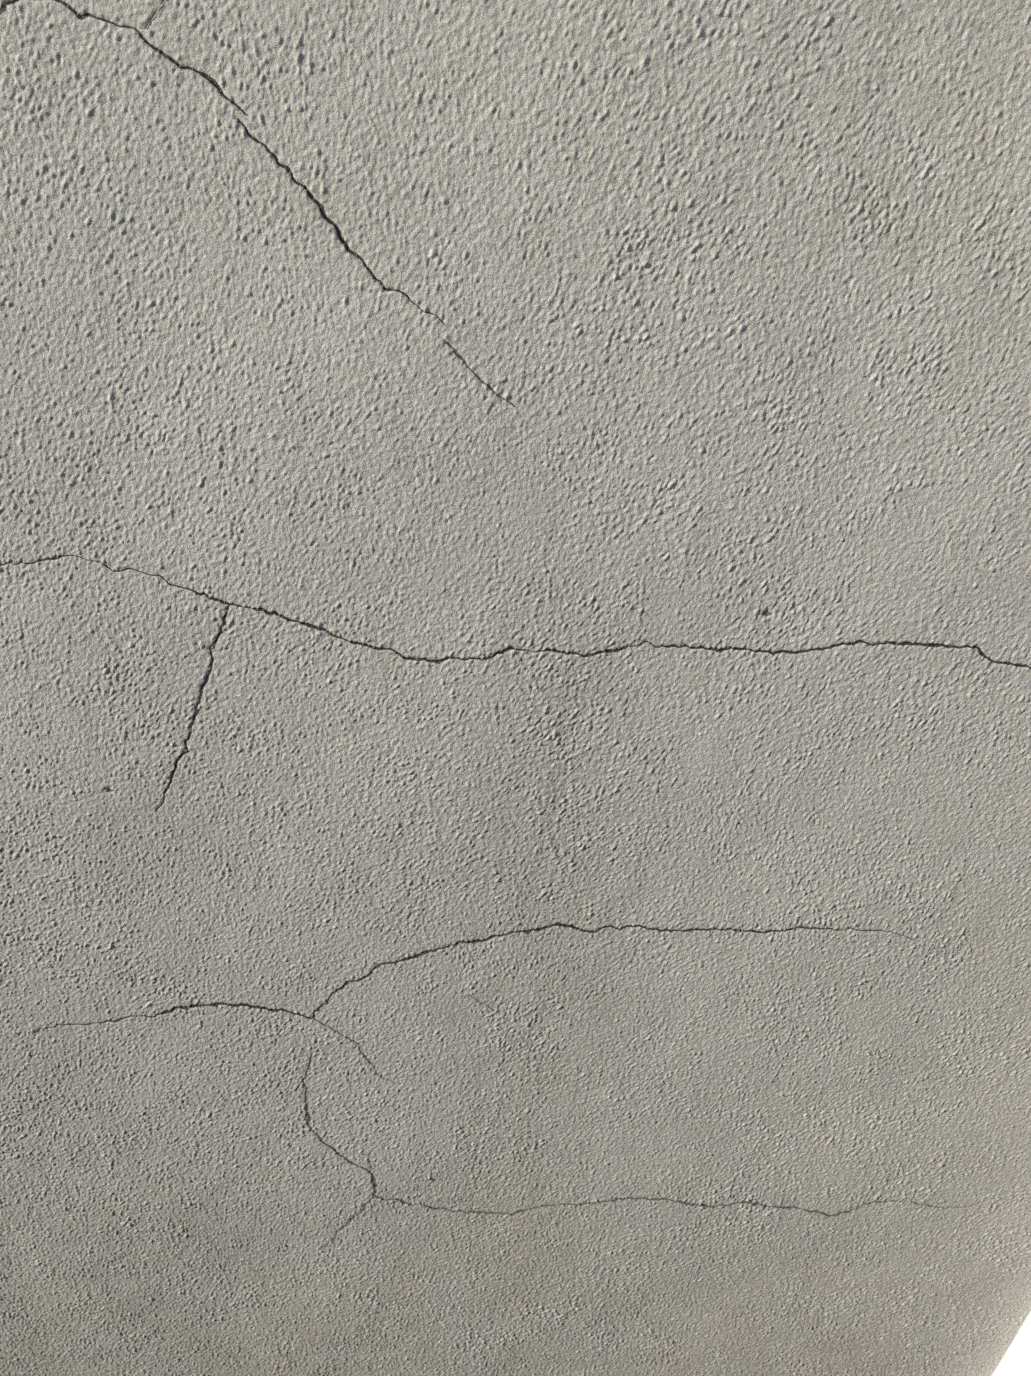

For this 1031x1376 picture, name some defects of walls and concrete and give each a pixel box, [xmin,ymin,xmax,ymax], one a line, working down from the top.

crack [0,0,18,13]
crack [54,0,515,407]
crack [0,555,1031,812]
crack [31,923,980,1249]